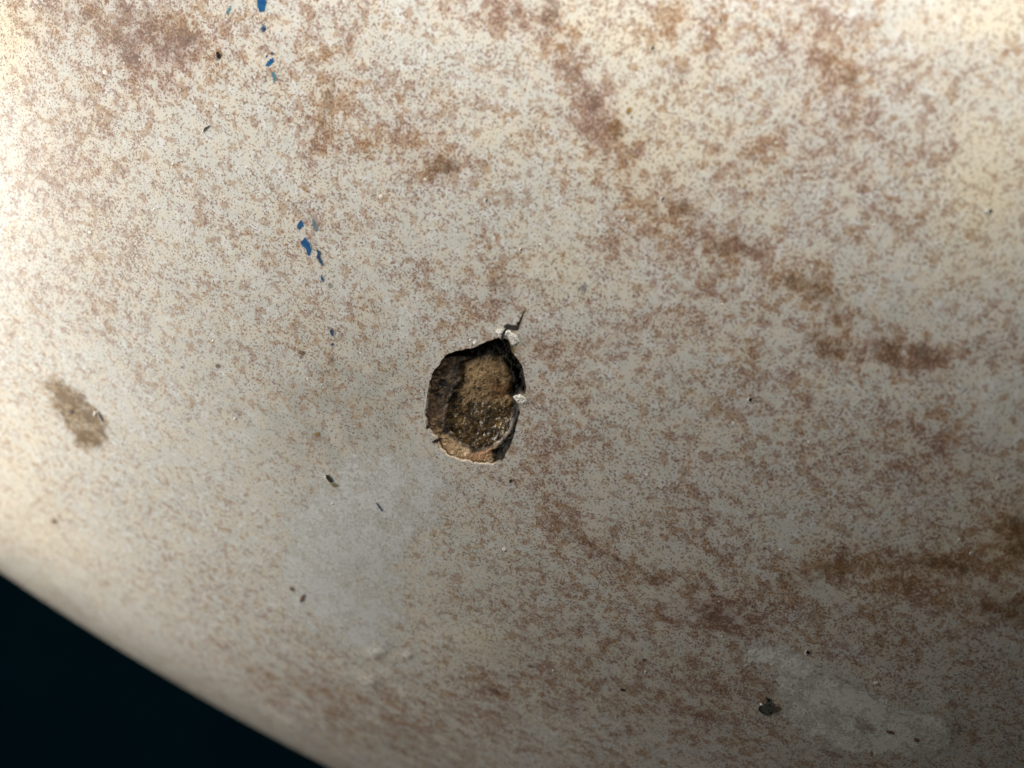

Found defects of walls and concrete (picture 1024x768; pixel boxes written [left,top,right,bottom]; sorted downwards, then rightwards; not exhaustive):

damp [47,381,107,447]